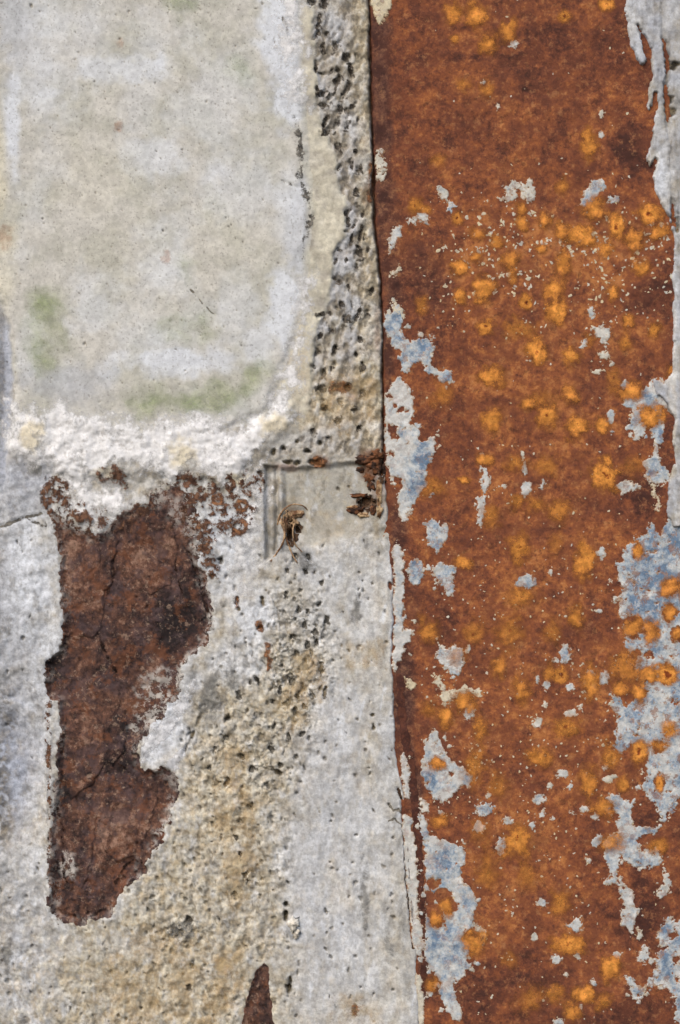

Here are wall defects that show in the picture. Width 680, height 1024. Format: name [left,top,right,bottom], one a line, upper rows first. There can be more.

peeling [496,177,536,203]
leakage [2,0,374,596]
corrosion [514,195,670,327]
corrosion [614,381,667,428]
corrosion [96,464,128,491]
corrosion [39,470,266,579]
peeling [378,297,457,690]
leakage [271,602,331,718]
peeling [432,637,482,723]
corrosion [544,576,680,706]
peeling [569,377,680,1024]
peeling [400,728,573,1024]